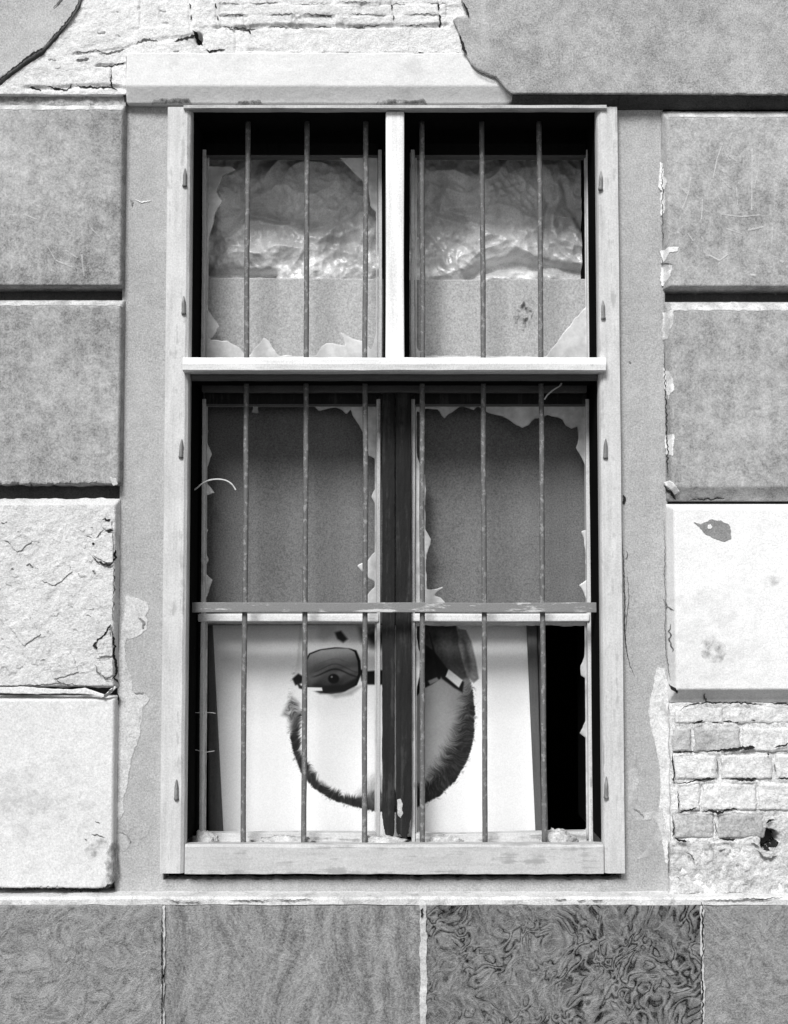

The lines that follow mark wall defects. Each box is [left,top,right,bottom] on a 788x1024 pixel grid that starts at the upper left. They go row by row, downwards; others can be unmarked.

spalling [0,0,467,102]
peeling [0,518,150,892]
spalling [627,519,788,894]